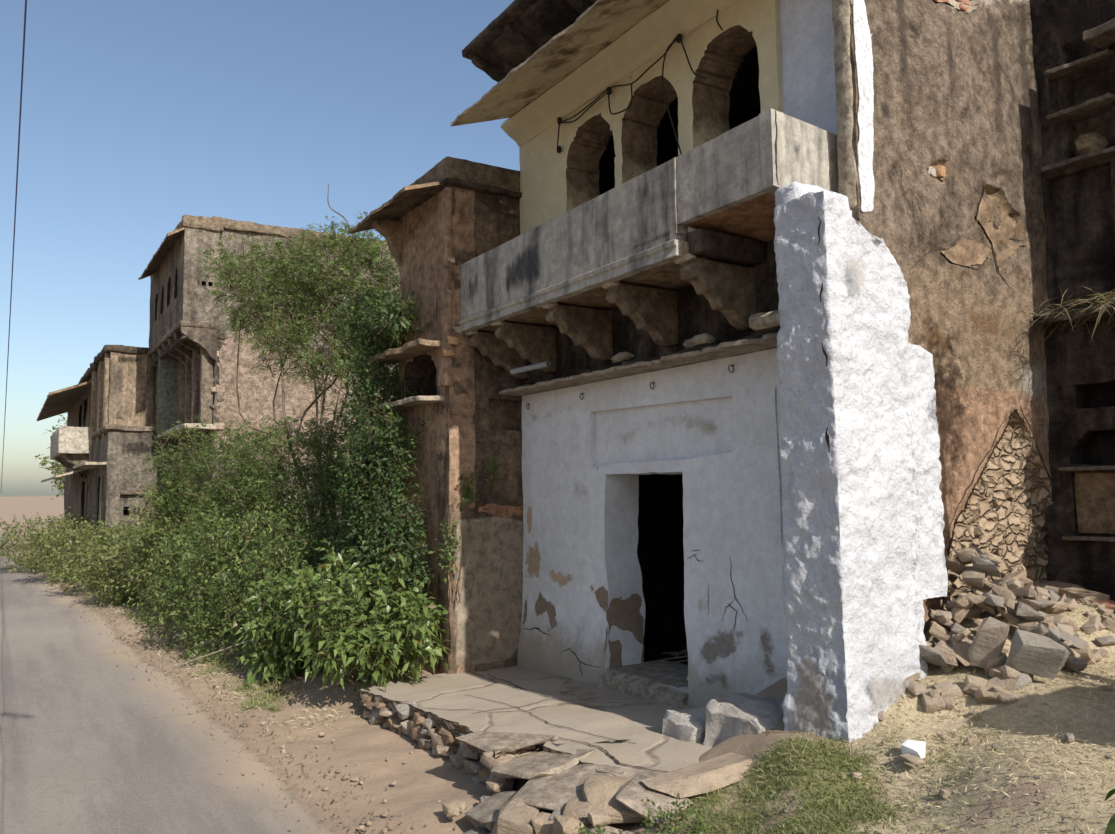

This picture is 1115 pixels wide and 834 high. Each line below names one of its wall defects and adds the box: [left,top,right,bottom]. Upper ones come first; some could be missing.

spalling [932,0,979,13]
spalling [927,158,951,181]
damp [506,243,538,290]
spalling [909,181,1027,286]
spalling [942,405,1054,611]
peeling [455,503,573,665]
crack [523,611,596,676]
spalling [590,585,644,668]
crack [708,557,747,630]
crack [464,673,668,772]